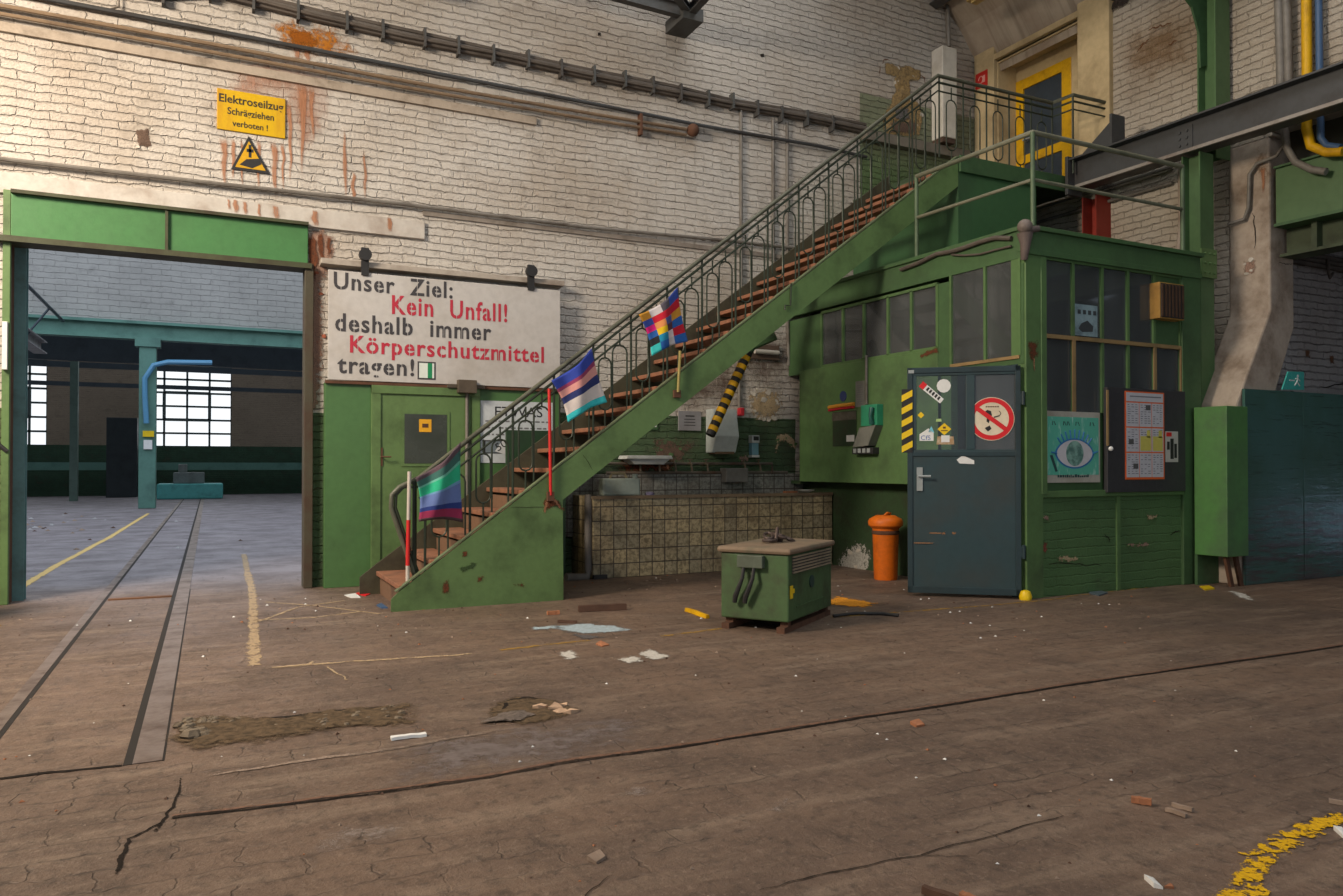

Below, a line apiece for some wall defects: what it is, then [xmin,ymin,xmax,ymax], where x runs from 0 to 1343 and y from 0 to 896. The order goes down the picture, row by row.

corrosion [275,23,351,60]
corrosion [221,76,314,188]
corrosion [343,135,367,197]
corrosion [228,200,279,217]
peeling [502,696,580,714]
crack [115,778,182,874]